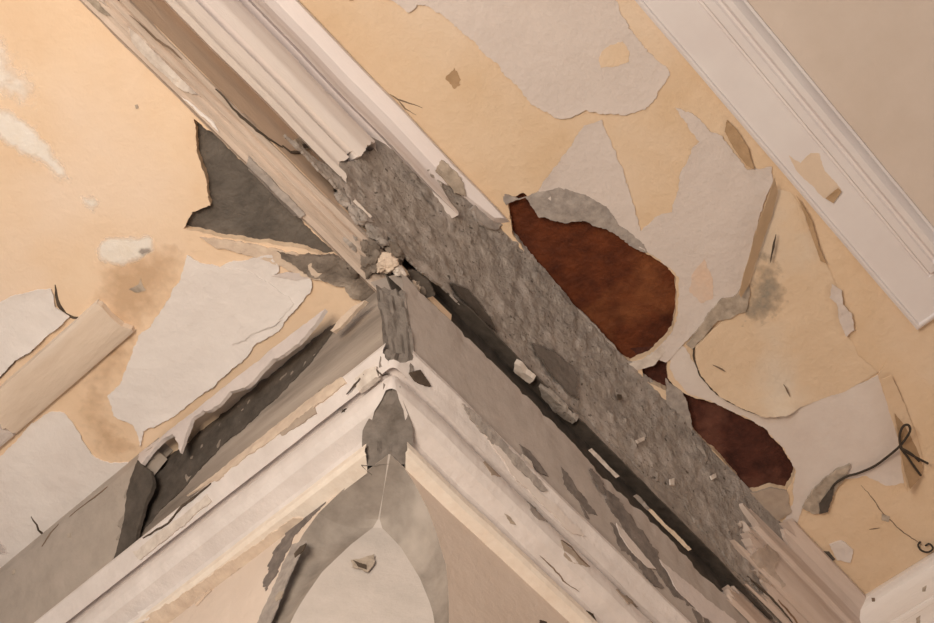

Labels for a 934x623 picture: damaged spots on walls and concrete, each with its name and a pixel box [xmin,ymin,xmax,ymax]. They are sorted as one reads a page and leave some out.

peeling [0,25,431,568]
peeling [129,502,326,623]
spalling [283,0,904,592]